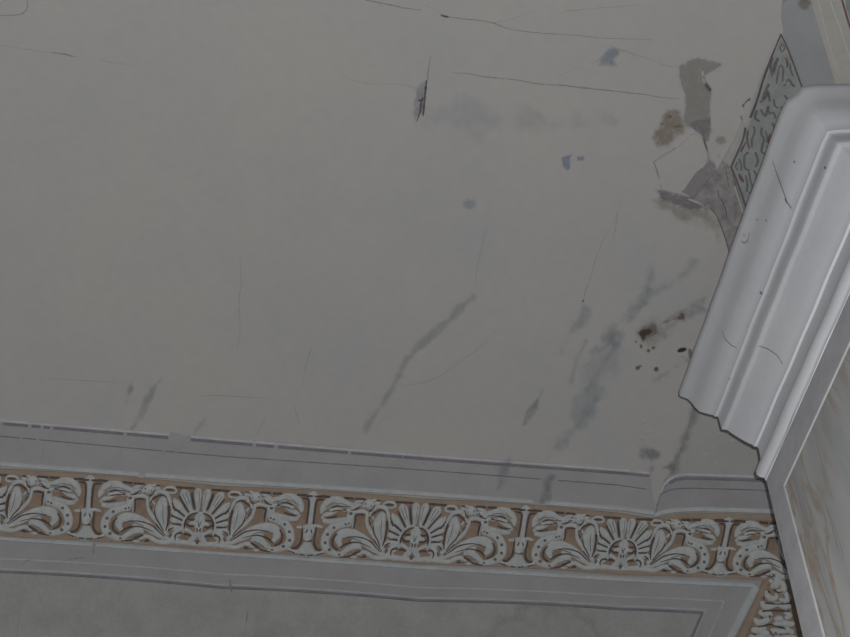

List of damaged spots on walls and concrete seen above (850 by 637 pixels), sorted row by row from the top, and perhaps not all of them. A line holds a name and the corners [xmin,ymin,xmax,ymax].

crack [349,56,431,122]
crack [366,0,676,99]
flaking render [653,59,720,209]
leakage [639,326,656,352]